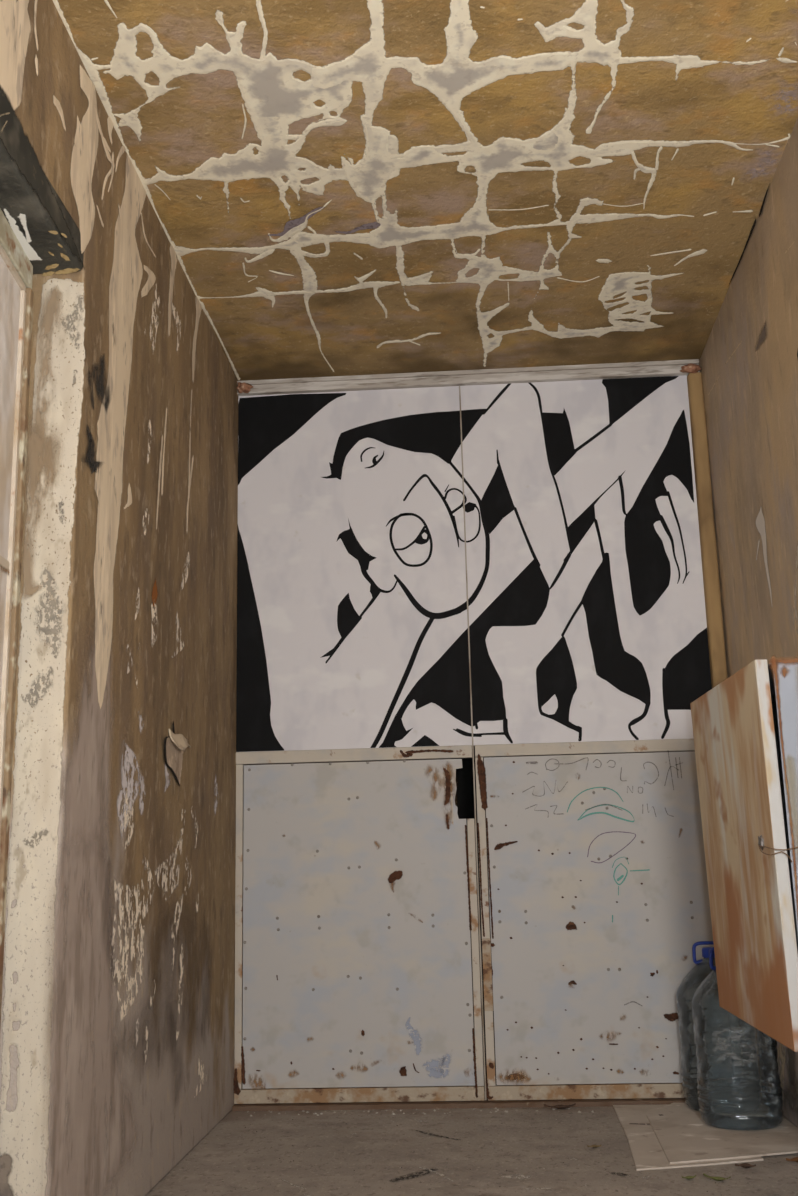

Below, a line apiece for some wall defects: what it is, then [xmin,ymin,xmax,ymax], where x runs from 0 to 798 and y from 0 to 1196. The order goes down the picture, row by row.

peeling [0,0,38,110]
peeling [53,0,797,710]
peeling [0,231,85,1196]
peeling [121,790,134,854]
flaking render [166,734,185,784]
rust [400,749,453,829]
rust [465,754,518,947]
peeling [110,806,199,1062]
rust [233,1046,265,1095]
rust [465,1028,549,1100]